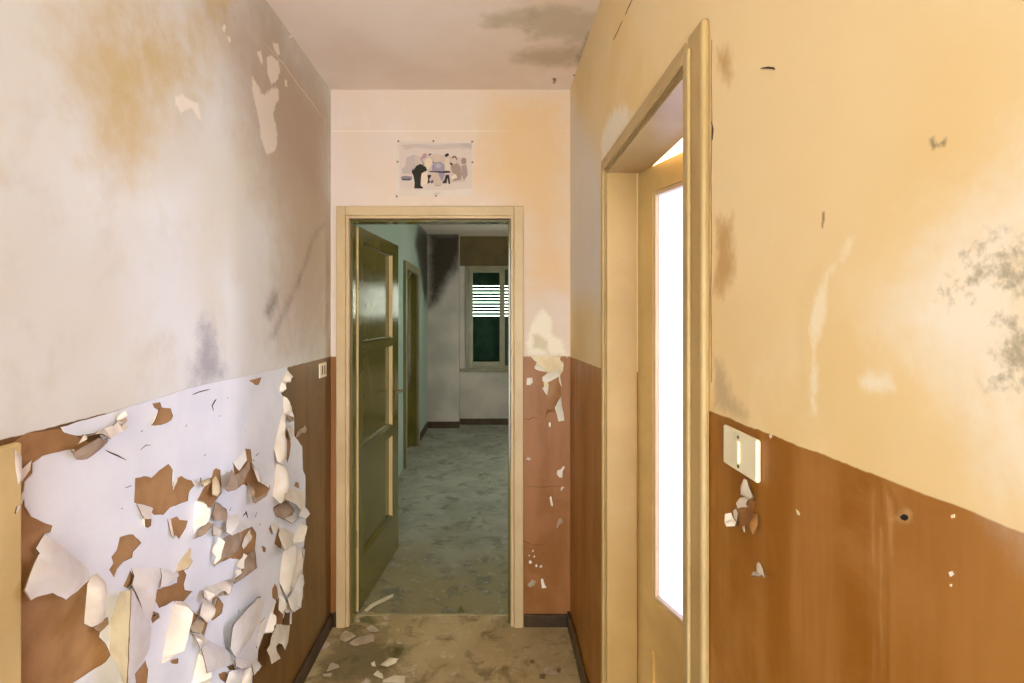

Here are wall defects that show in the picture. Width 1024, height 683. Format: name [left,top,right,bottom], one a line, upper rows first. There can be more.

peeling [14,367,310,683]
leakage [0,0,331,453]
spalling [248,35,293,163]
leakage [438,0,607,352]
spalling [523,303,570,428]
peeling [724,479,758,534]
peeling [752,562,766,578]
leakage [801,21,1024,653]